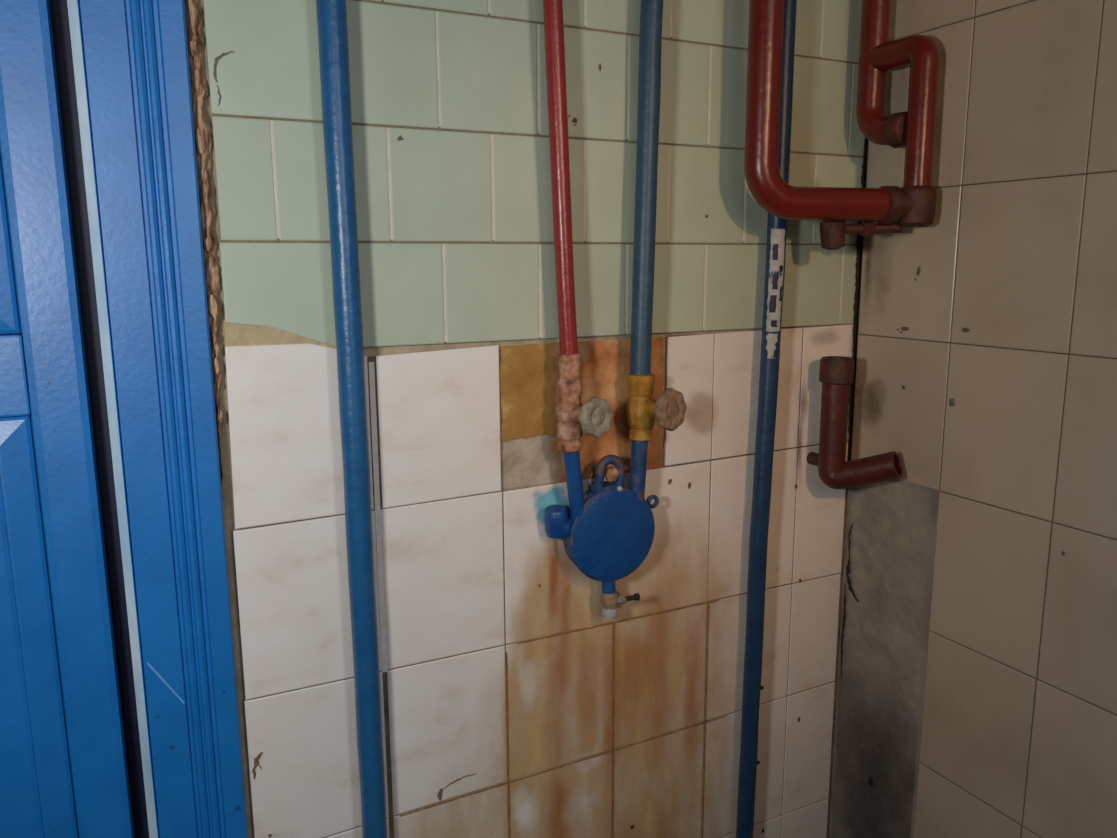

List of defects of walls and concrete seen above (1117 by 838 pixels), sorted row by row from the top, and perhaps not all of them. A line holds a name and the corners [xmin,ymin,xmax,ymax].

spalling [209,295,336,349]
corrosion [578,339,632,479]
corrosion [646,417,664,470]
corrosion [651,337,665,400]
corrosion [400,551,726,838]
spalling [831,479,940,838]